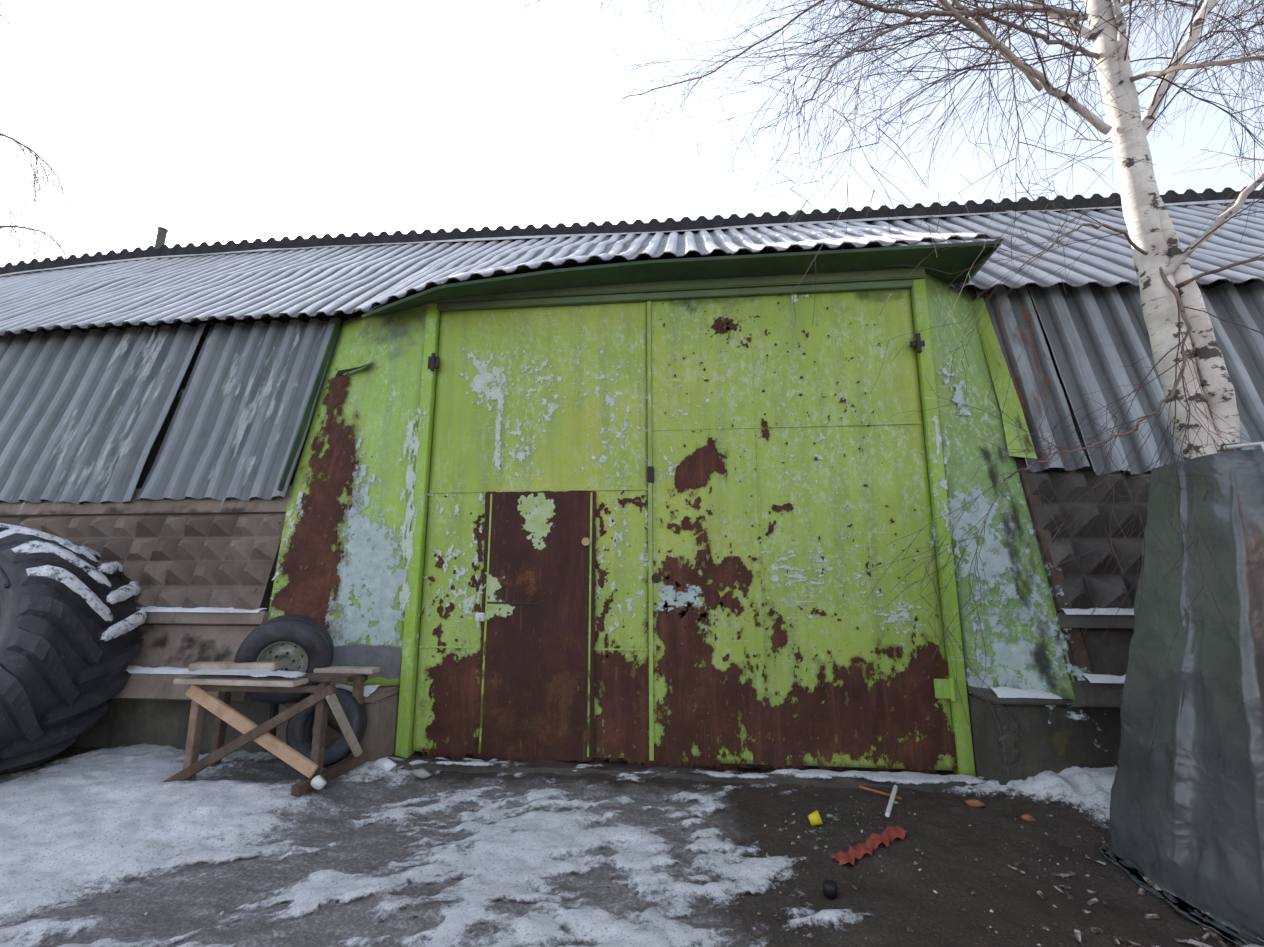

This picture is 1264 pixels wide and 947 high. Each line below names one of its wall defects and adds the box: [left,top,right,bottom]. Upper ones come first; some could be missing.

corrosion [271,366,372,629]
peeling [324,396,515,678]
peeling [453,335,755,550]
peeling [596,507,704,636]
corrosion [418,413,958,774]
corrosion [704,302,819,373]
peeling [780,409,842,510]
peeling [750,518,933,647]
corrosion [821,380,880,457]
peeling [922,360,1087,724]